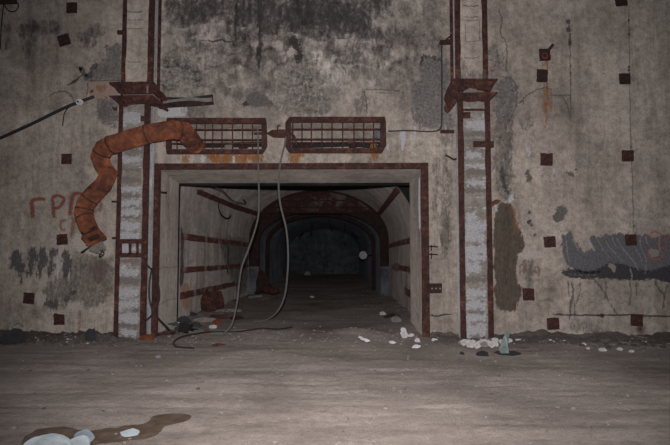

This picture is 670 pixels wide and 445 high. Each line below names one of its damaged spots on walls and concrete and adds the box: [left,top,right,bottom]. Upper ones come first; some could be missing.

rust [183,154,263,163]
damp [493,202,533,311]